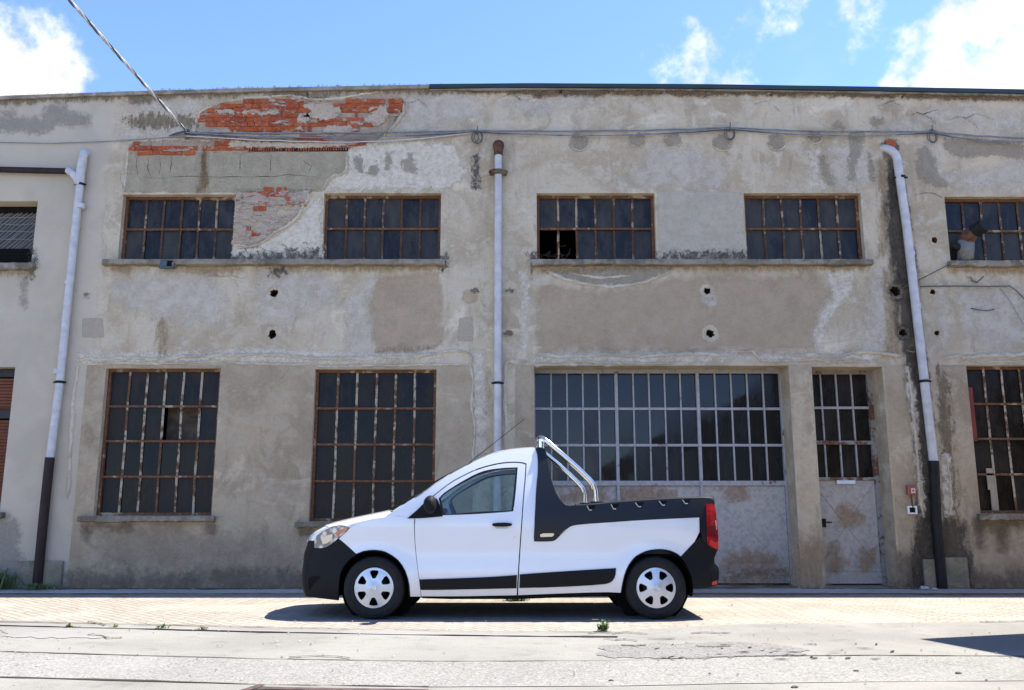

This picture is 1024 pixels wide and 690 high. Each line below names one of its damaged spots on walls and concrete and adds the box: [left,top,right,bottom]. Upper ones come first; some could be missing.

spalling [116,90,1024,259]
damp [883,154,1024,588]